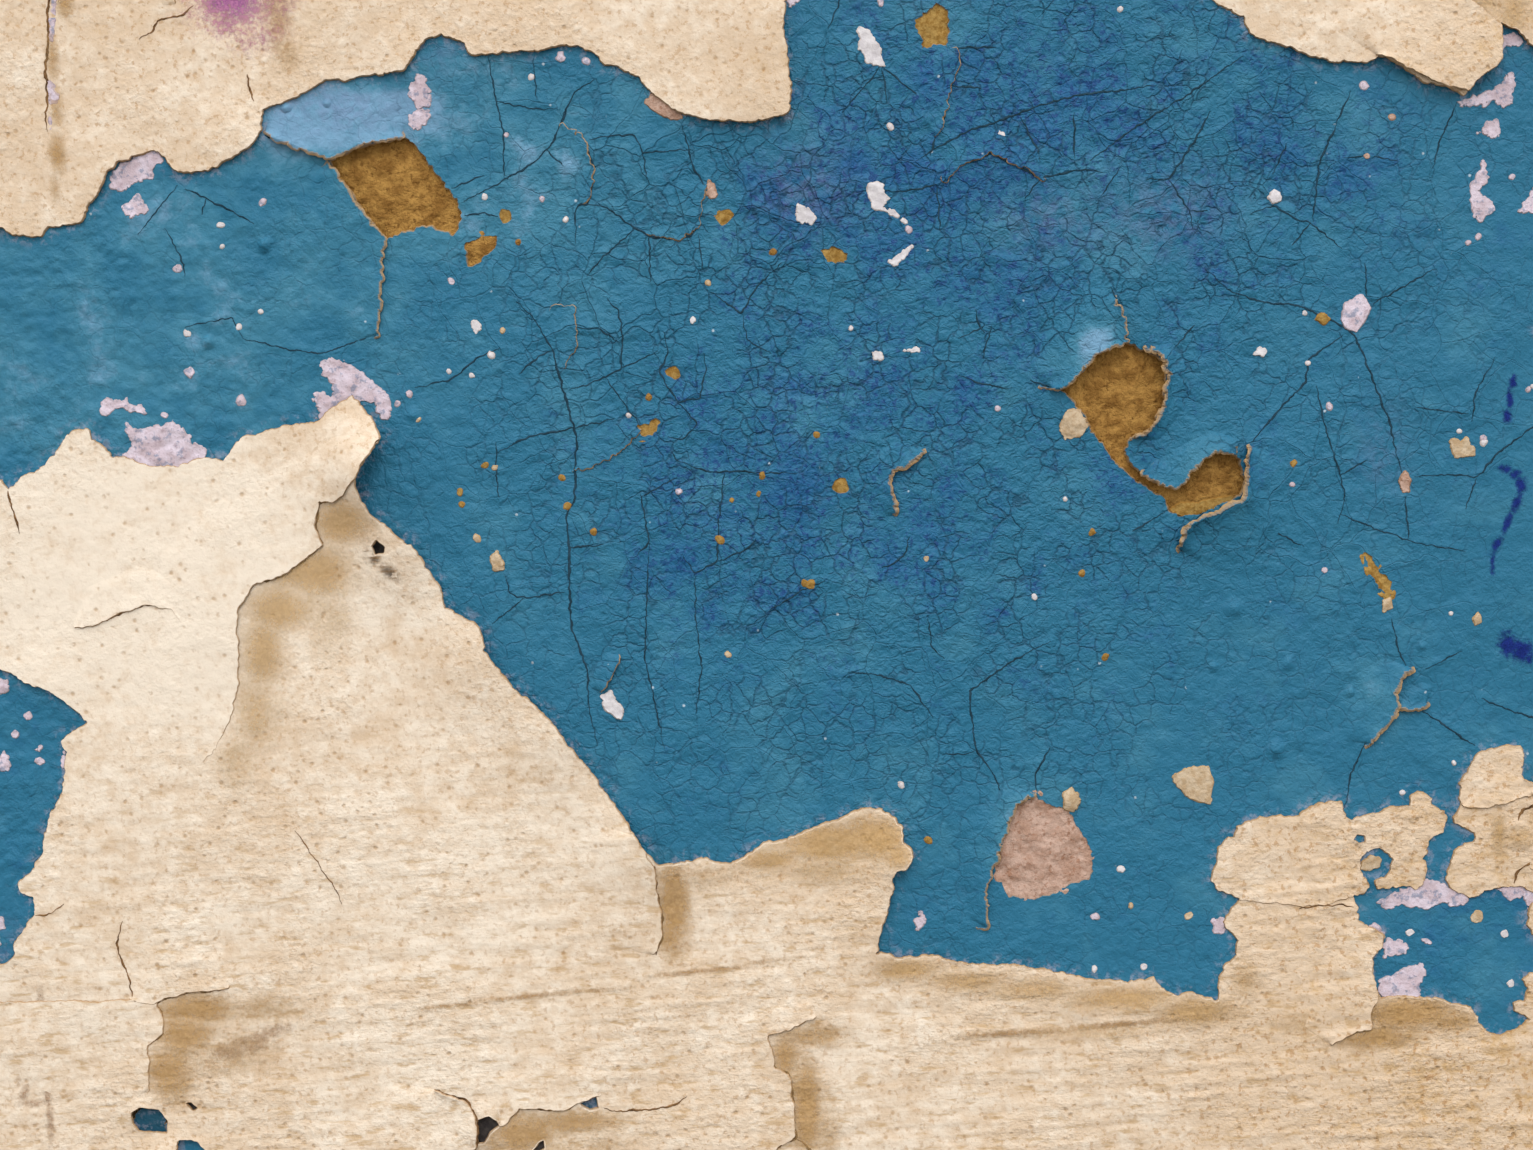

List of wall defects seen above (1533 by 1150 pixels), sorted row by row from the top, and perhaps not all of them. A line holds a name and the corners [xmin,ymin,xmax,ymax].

spalling [263,84,461,344]
crack [845,44,1243,230]
peeling [1332,0,1504,91]
crack [7,492,19,531]
crack [415,58,797,748]
spalling [1029,282,1290,571]
crack [1205,93,1533,552]
peeling [0,670,87,964]
crack [115,921,133,996]
spalling [962,784,1094,931]
peeling [1303,848,1533,1045]
crack [604,1097,686,1112]